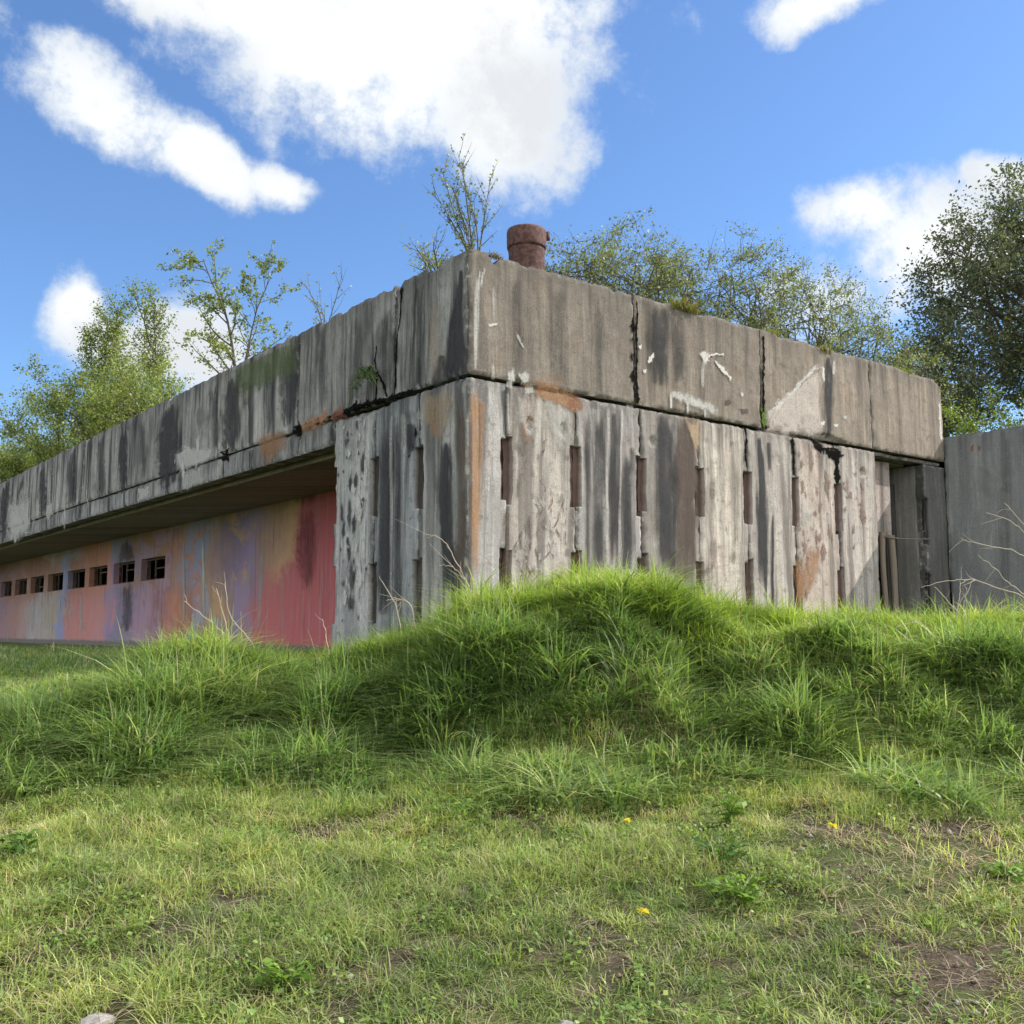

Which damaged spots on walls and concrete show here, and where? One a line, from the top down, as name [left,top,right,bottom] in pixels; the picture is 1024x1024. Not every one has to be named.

leakage [0,443,103,542]
leakage [118,430,149,501]
leakage [157,377,240,489]
leakage [266,350,297,432]
crack [305,287,413,427]
corrosion [469,398,483,590]
corrosion [521,381,582,425]
crack [630,301,640,404]
leakage [648,309,683,384]
crack [744,336,767,467]
crack [788,439,796,475]